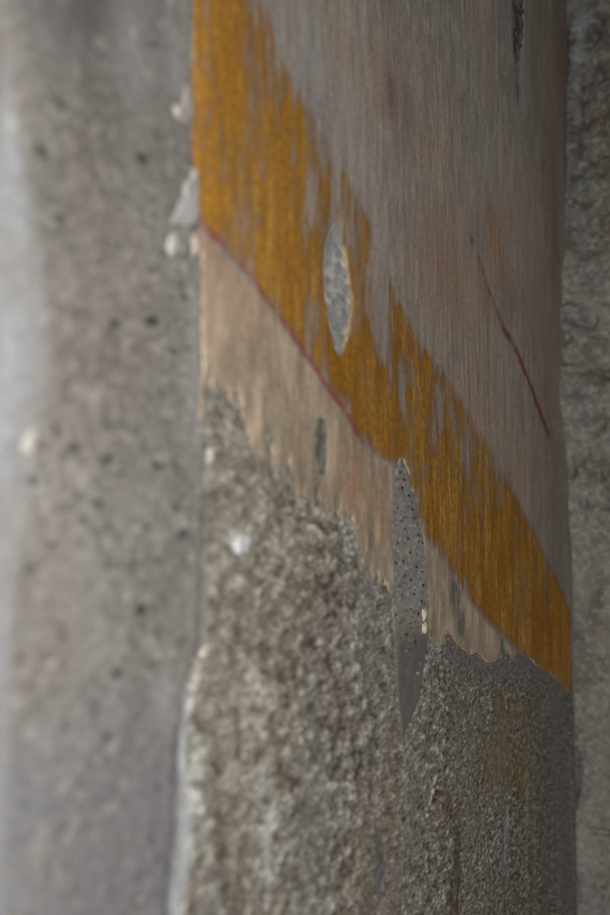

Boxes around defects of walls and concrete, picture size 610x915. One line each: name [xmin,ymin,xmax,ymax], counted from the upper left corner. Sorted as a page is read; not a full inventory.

flaking render [512,0,524,64]
flaking render [324,224,354,355]